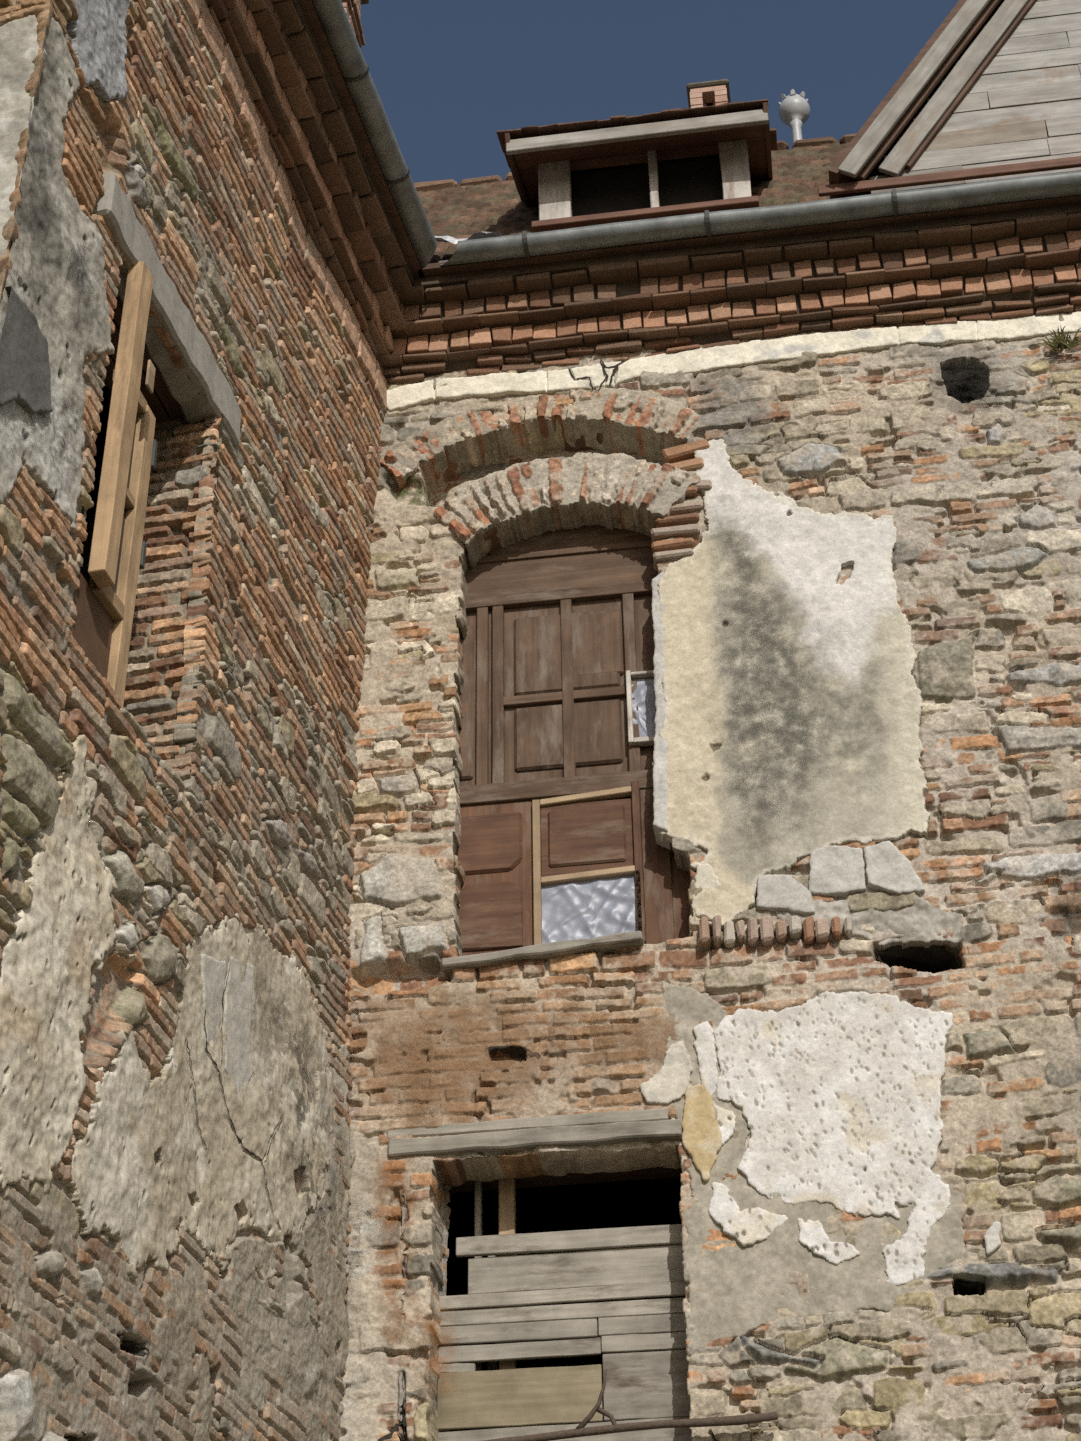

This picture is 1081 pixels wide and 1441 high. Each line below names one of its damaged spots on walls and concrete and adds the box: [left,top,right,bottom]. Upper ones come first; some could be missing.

peeling [0,15,47,257]
crack [568,358,629,391]
peeling [691,864,721,902]
spalling [756,841,963,974]
peeling [201,954,254,1099]
crack [187,967,286,1247]
flaking render [662,981,965,1350]
spalling [954,1281,982,1296]